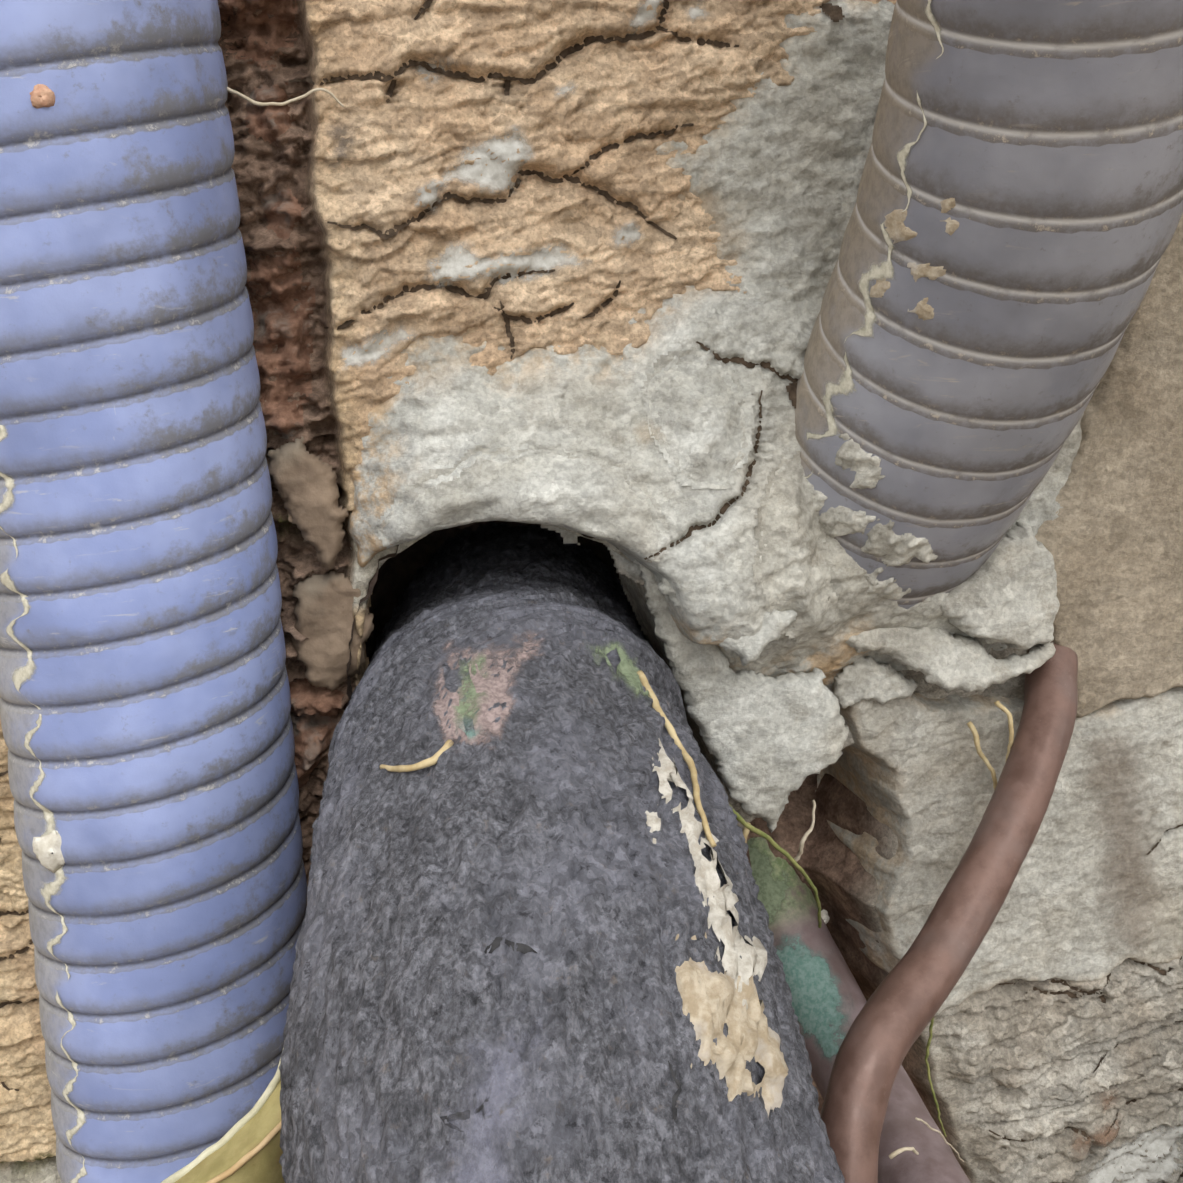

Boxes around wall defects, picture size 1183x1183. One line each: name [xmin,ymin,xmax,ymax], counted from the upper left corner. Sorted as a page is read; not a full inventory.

crack [289,0,739,103]
crack [327,123,694,240]
crack [324,269,621,359]
crack [644,341,798,560]
peeling [633,522,1060,833]
crack [1147,824,1183,855]
crack [998,956,1182,1003]
crack [989,1088,1183,1143]